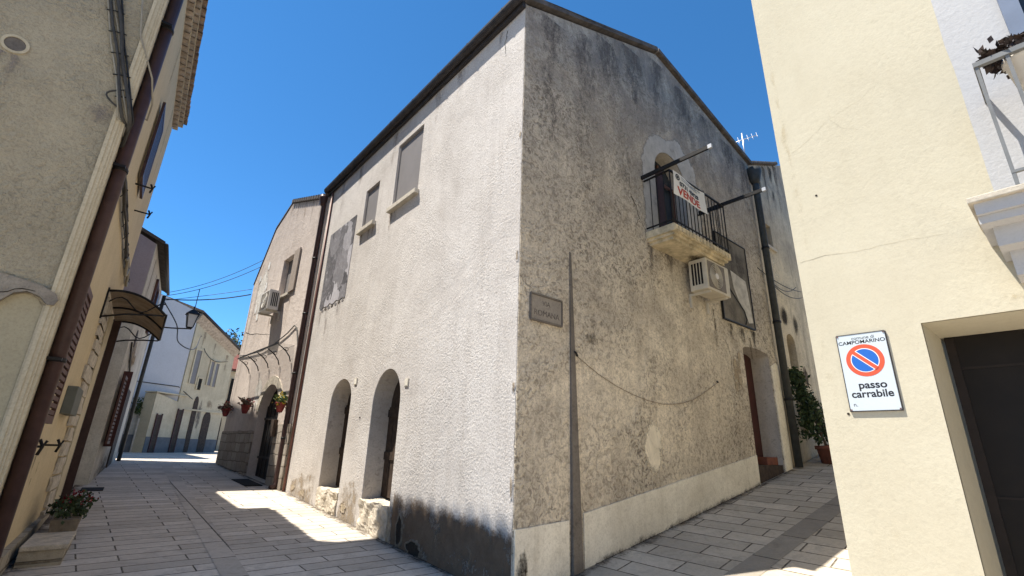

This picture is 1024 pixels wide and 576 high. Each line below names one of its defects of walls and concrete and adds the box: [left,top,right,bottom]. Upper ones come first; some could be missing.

water stain [390,494,527,576]